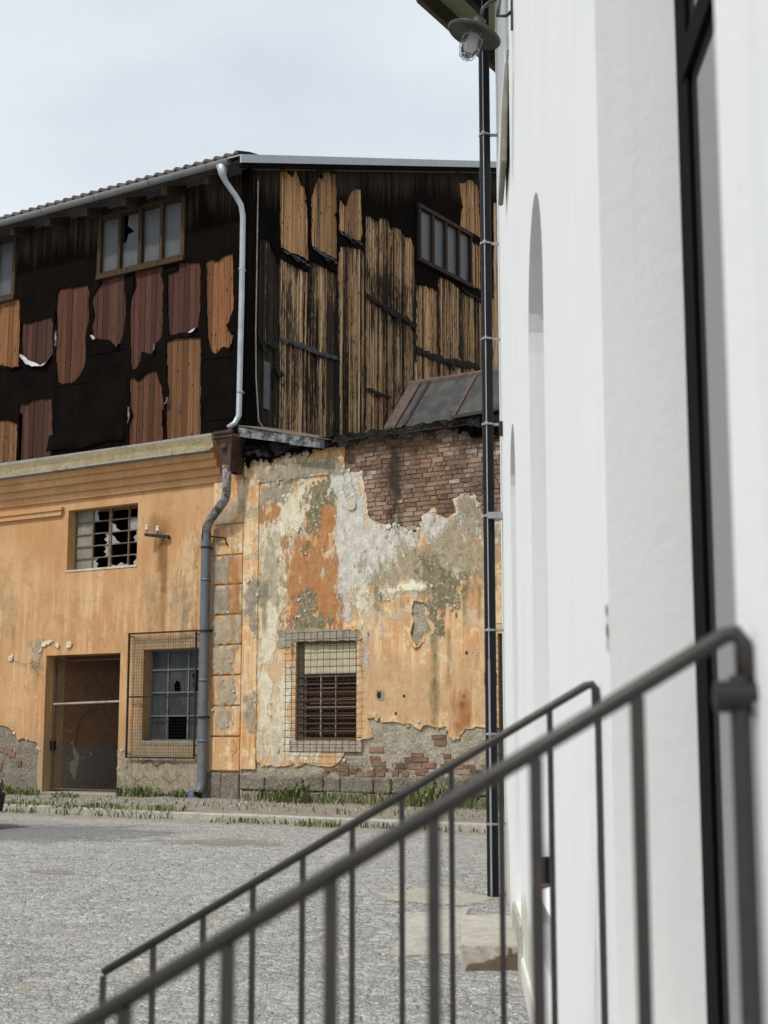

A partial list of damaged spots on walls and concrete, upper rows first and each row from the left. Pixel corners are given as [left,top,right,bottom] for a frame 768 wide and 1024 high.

peeling [276,169,364,266]
peeling [0,254,234,445]
peeling [274,337,338,389]
spalling [242,429,501,782]
water stain [354,443,501,661]
spalling [0,726,41,773]